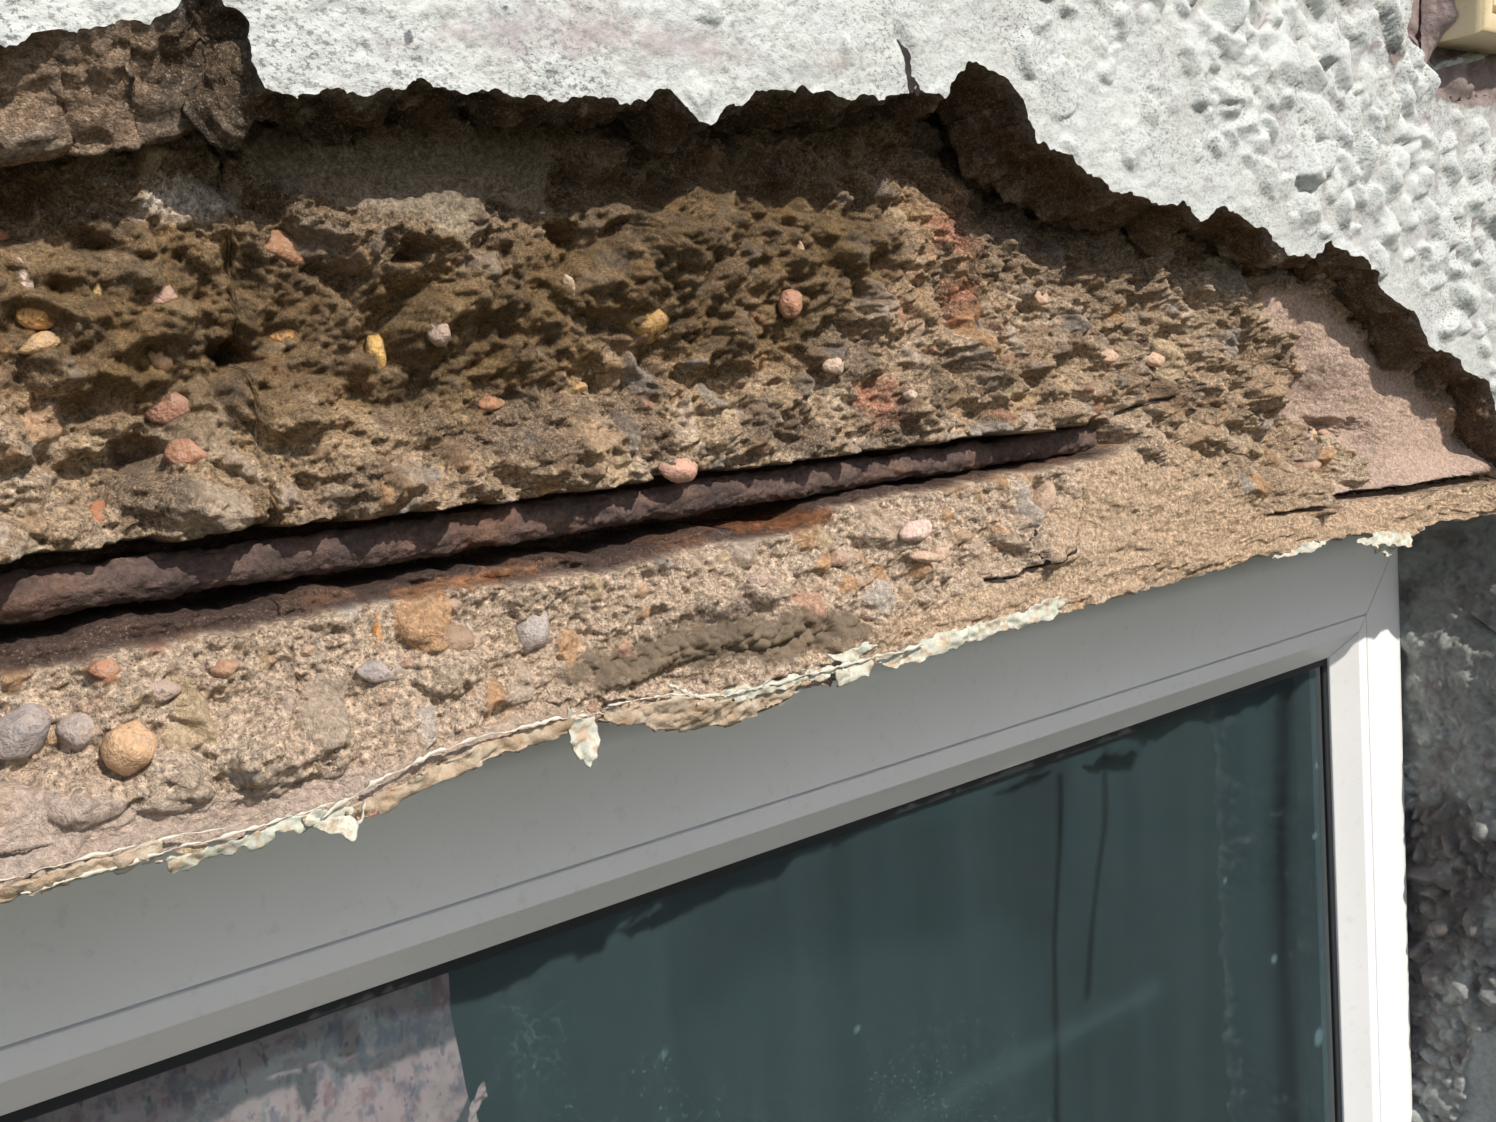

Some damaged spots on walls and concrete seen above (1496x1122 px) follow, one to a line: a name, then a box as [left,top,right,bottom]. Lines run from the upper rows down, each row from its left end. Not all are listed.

spalling [0,0,1496,887]
rust [676,508,832,532]
rust [393,566,535,596]
crack [0,845,50,858]
peeling [0,839,165,904]